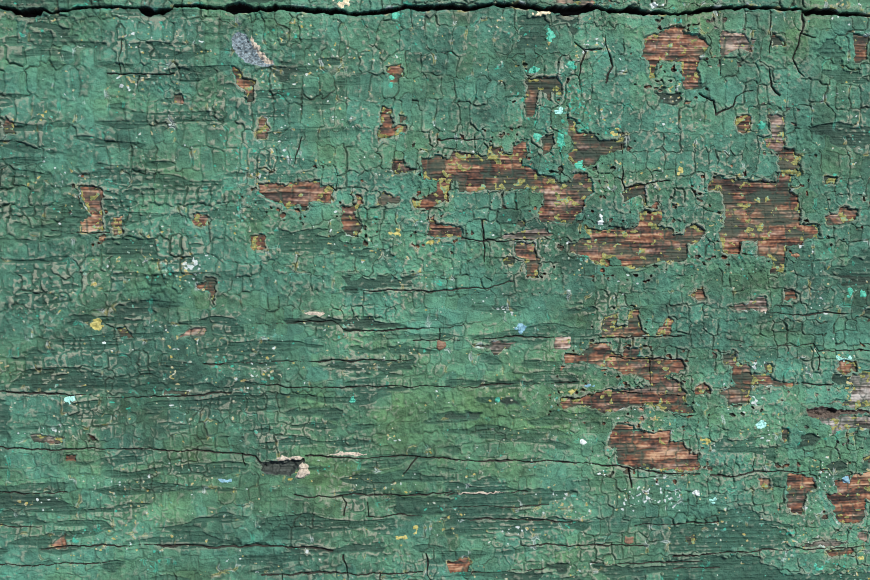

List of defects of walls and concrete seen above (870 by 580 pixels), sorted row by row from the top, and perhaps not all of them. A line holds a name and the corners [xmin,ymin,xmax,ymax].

crack [0,3,869,116]
peeling [630,2,756,104]
peeling [72,174,124,246]
peeling [241,61,864,283]
crack [204,320,575,389]
peeling [548,305,798,484]
peeling [804,342,870,446]
crack [0,544,431,580]
crack [294,490,579,523]
crack [305,455,828,488]
crack [521,521,870,569]
peeling [774,455,870,560]